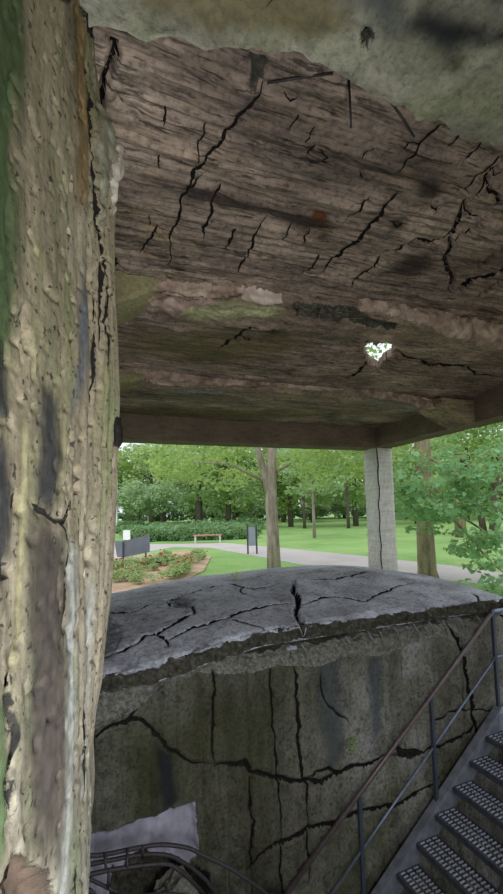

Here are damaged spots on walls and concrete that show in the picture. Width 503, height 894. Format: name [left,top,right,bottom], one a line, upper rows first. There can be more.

crack [84,36,119,406]
crack [139,81,263,264]
crack [225,214,269,274]
crack [284,92,330,163]
crack [282,124,503,289]
crack [218,327,251,350]
crack [399,351,499,377]
crack [82,448,443,894]
crack [424,624,491,752]